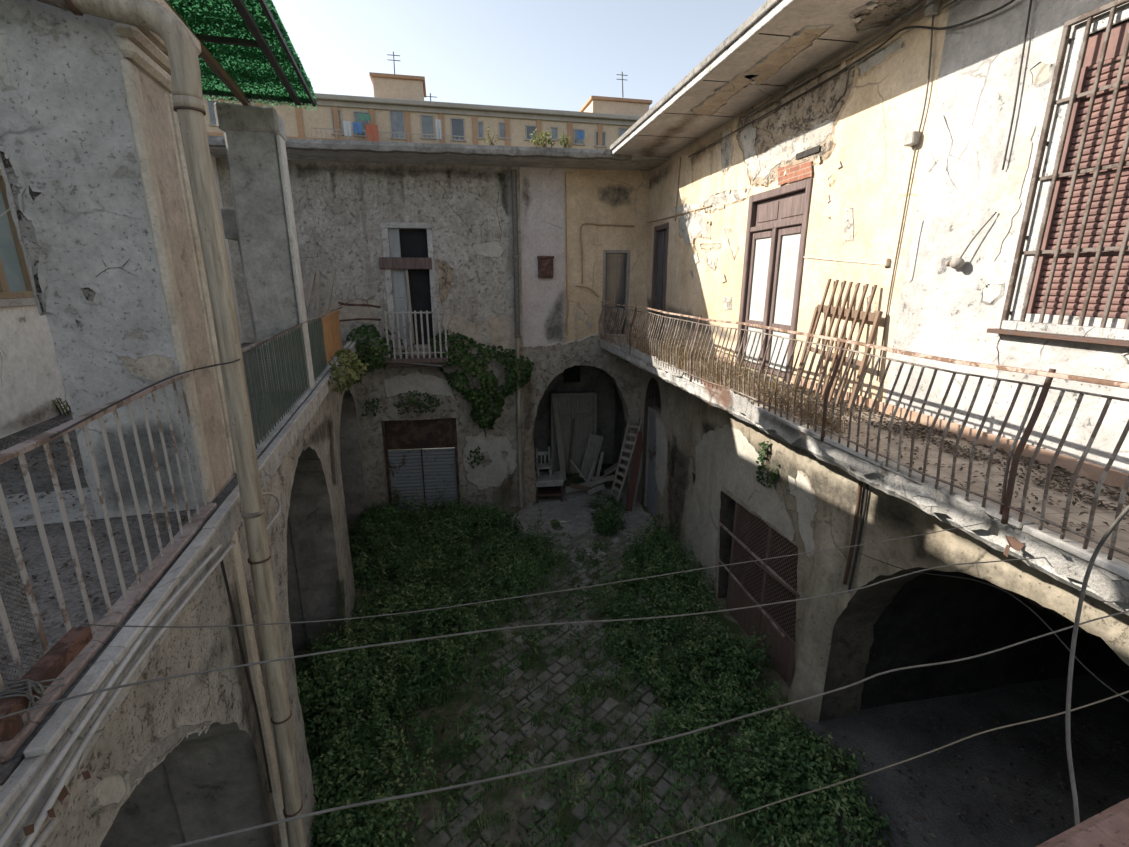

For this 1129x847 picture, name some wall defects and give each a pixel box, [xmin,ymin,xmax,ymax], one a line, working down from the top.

spalling [671,0,925,283]
rust [703,380,731,407]